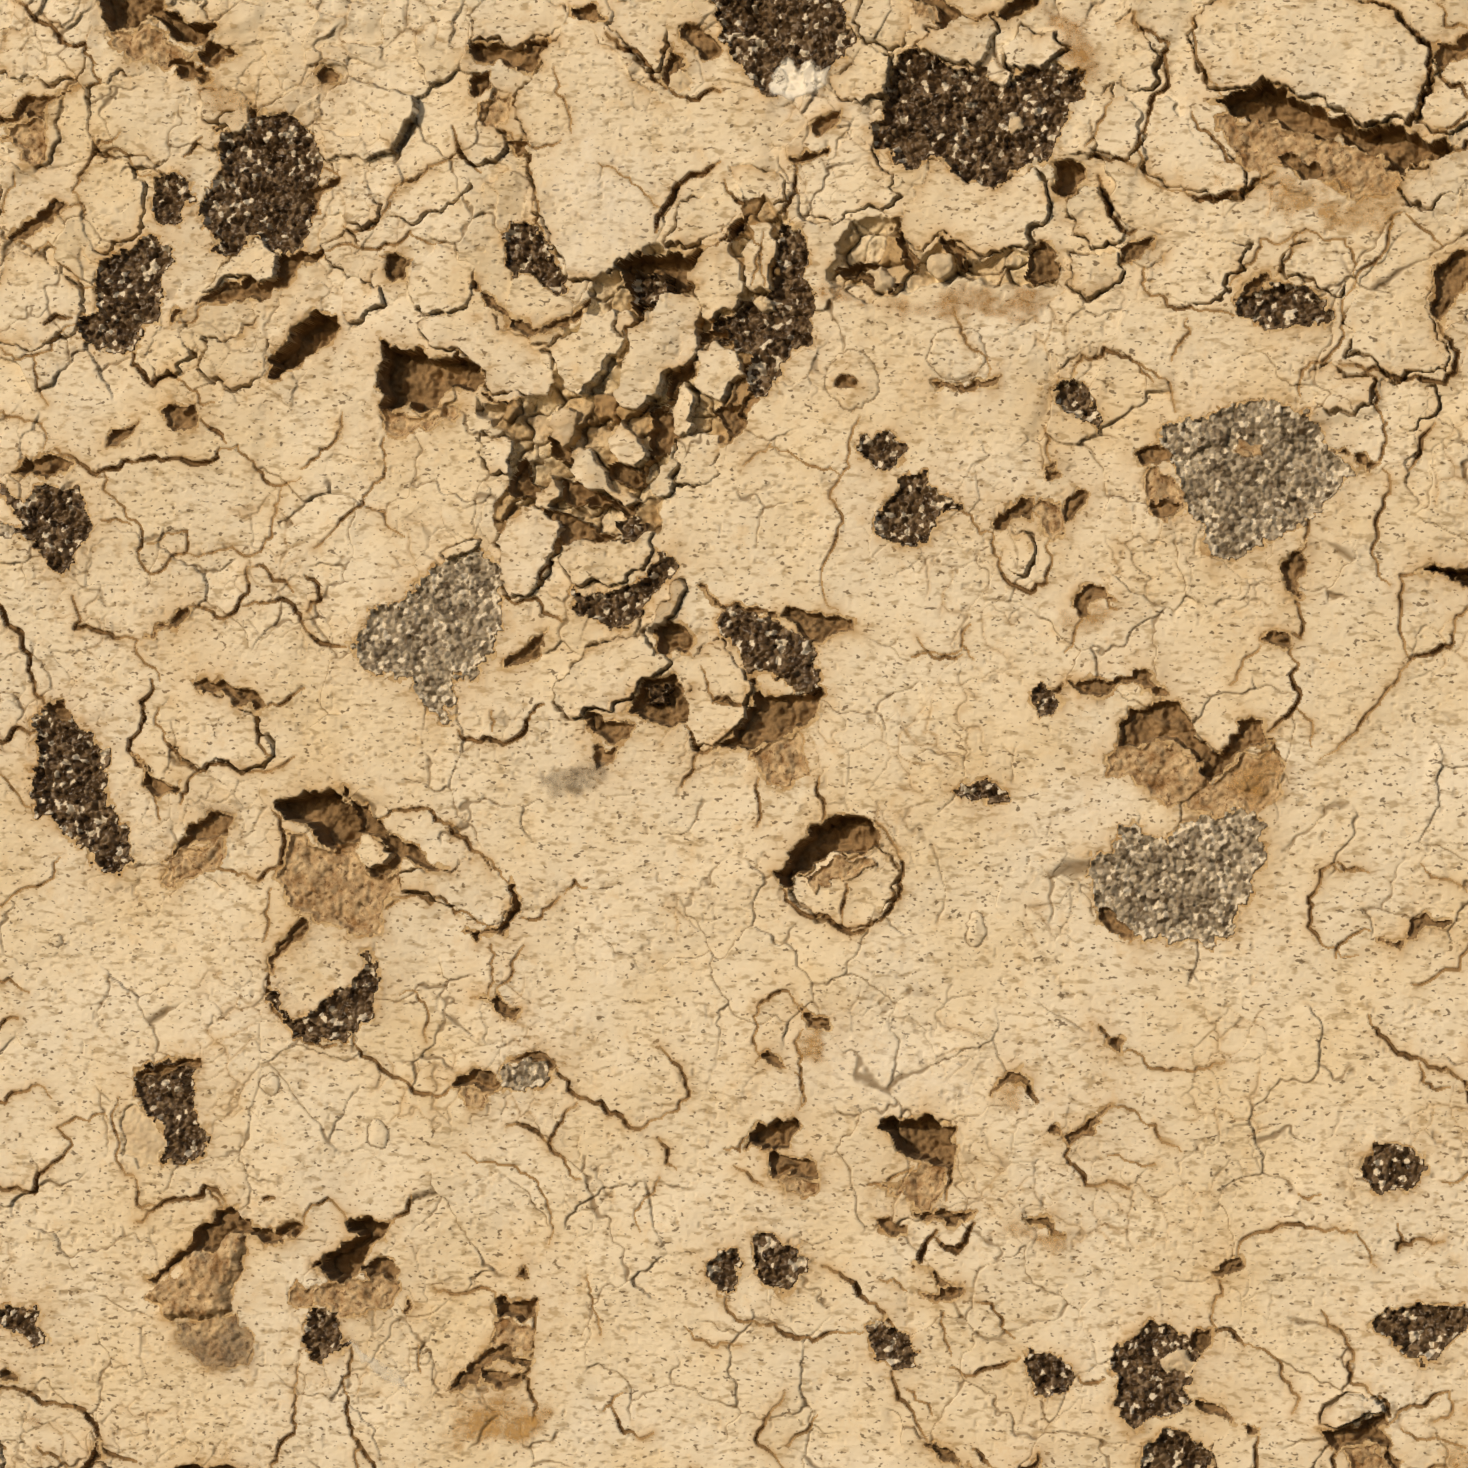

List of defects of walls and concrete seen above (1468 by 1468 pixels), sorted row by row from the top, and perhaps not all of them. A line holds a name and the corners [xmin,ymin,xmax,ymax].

crack [597,161,799,287]
crack [0,172,405,648]
peeling [0,0,1468,792]
crack [1073,0,1468,760]
spalling [26,698,137,878]
crack [72,595,305,821]
spalling [264,782,522,1047]
spalling [772,812,901,929]
spalling [1027,668,1287,953]
crack [461,1047,691,1245]
crack [683,1136,976,1349]
spalling [1106,1316,1261,1468]